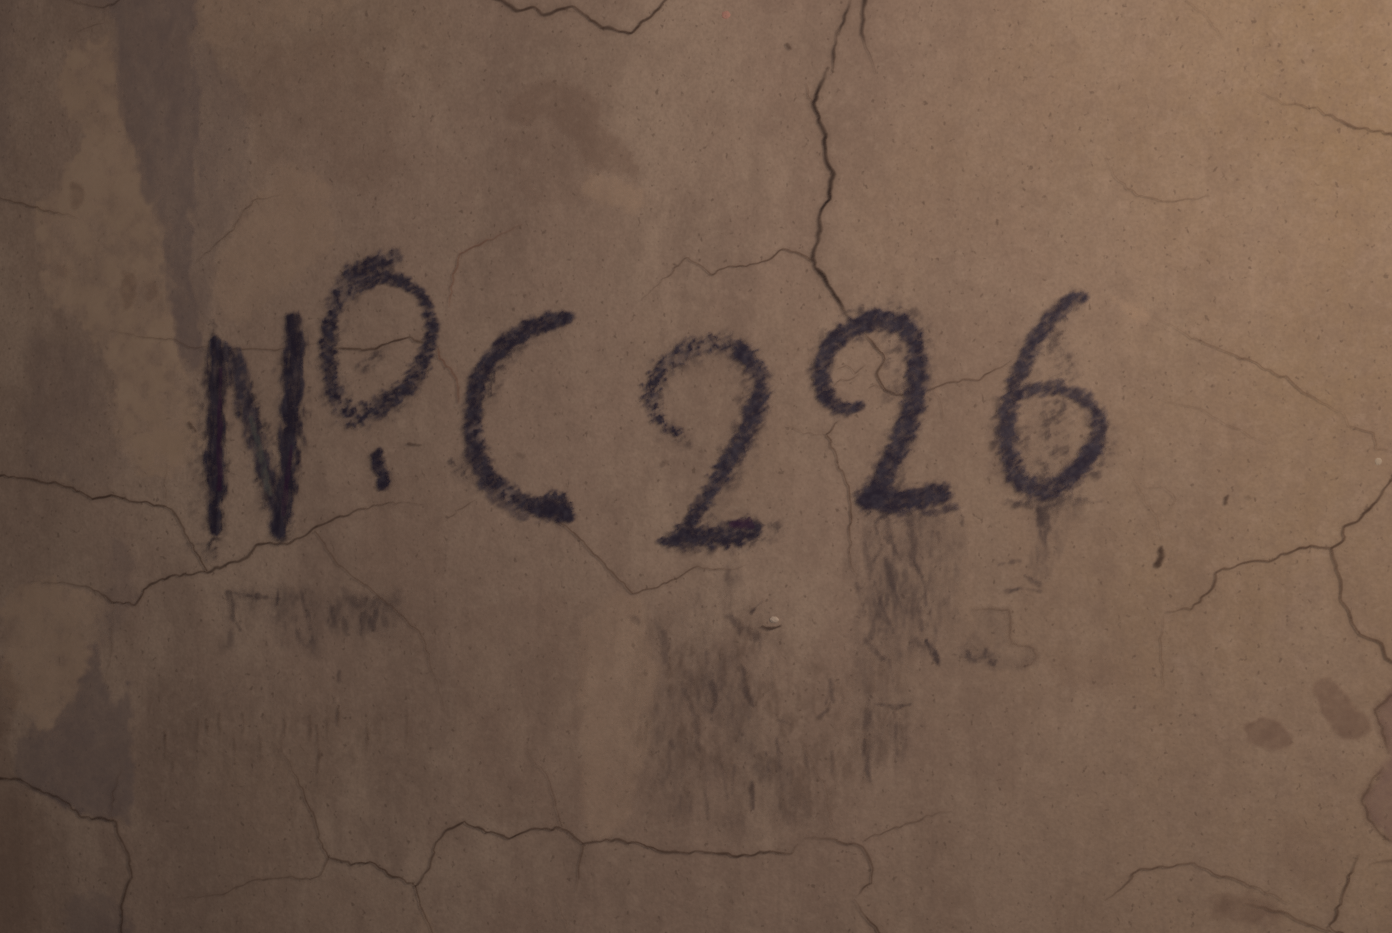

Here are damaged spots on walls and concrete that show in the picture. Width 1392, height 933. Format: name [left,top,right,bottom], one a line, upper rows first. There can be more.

crack [502,0,664,34]
crack [735,0,866,307]
crack [342,337,440,359]
crack [869,338,904,395]
crack [0,474,340,605]
crack [1202,480,1392,662]
crack [0,777,132,933]
crack [322,821,777,901]
crack [1331,872,1352,933]